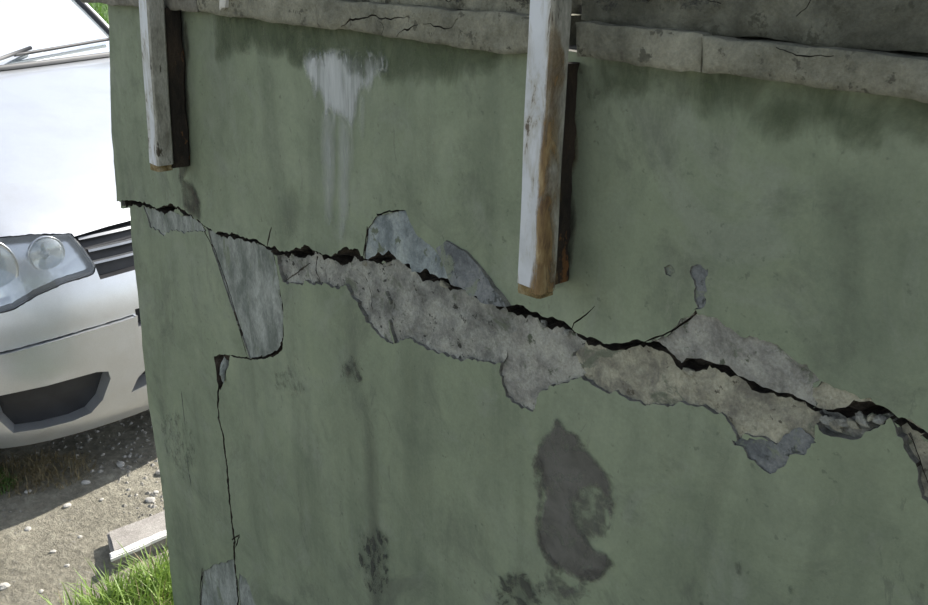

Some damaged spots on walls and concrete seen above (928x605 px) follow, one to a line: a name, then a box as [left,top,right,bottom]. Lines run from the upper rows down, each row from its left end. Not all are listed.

leakage [304,53,382,121]
crack [283,247,316,280]
crack [340,250,396,296]
flaking render [145,206,895,473]
crack [630,317,693,343]
crack [220,354,230,383]
crack [682,358,712,377]
crack [819,401,888,433]
flaking render [902,419,928,497]
leakage [498,420,613,605]
peeling [201,559,255,605]